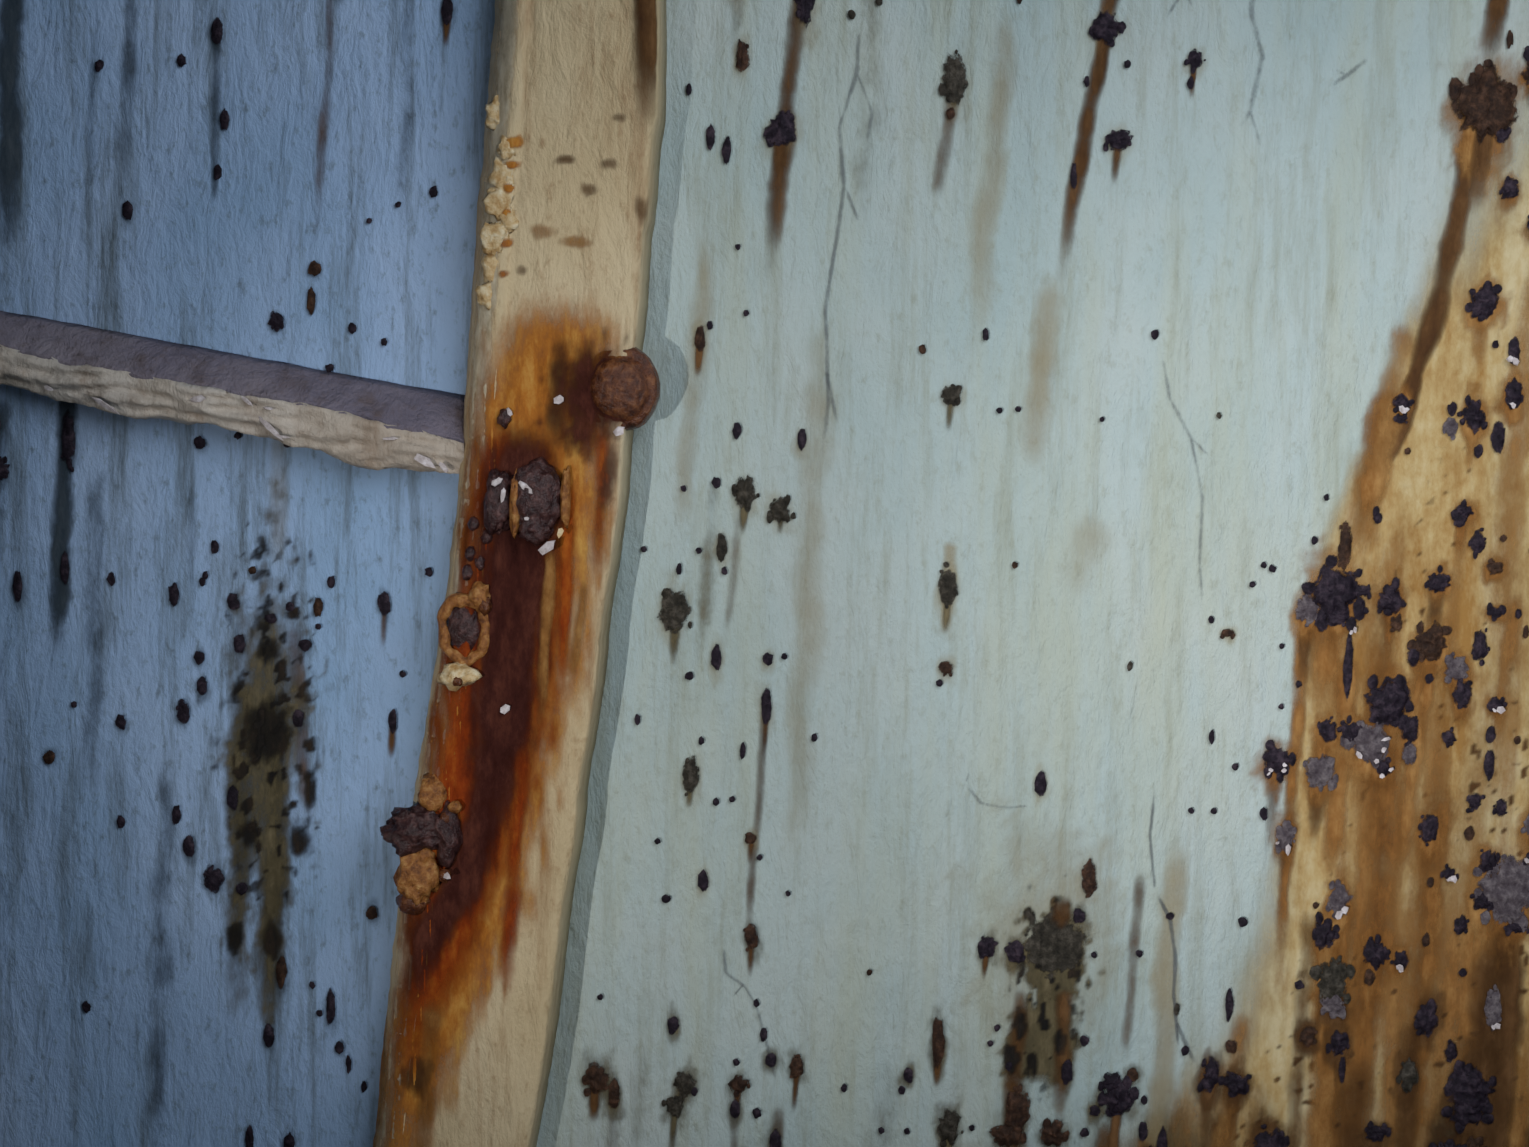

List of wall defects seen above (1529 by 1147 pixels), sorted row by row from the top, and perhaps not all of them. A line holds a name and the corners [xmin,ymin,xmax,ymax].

corrosion [763,0,815,235]
corrosion [1064,0,1133,239]
corrosion [938,562,958,628]
corrosion [1139,0,1529,1147]
corrosion [334,310,622,1147]
corrosion [932,1017,947,1082]
corrosion [937,858,1147,1147]